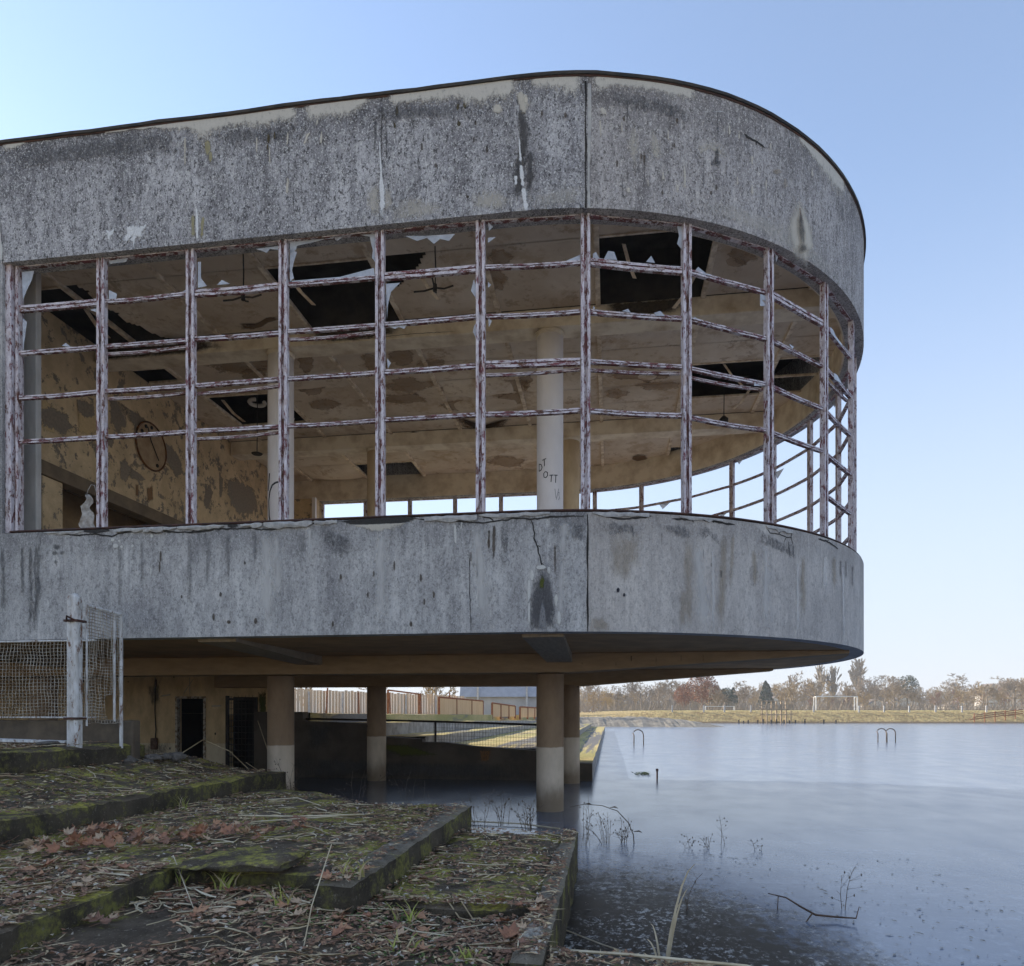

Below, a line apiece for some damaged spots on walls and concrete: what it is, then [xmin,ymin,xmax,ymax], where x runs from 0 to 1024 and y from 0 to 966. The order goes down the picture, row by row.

leakage [370,122,391,216]
leakage [511,109,533,210]
peeling [41,399,96,436]
peeling [108,401,145,448]
peeling [203,473,260,519]
leakage [21,547,40,619]
leakage [470,526,496,608]
leakage [527,525,566,628]
crack [456,515,735,565]